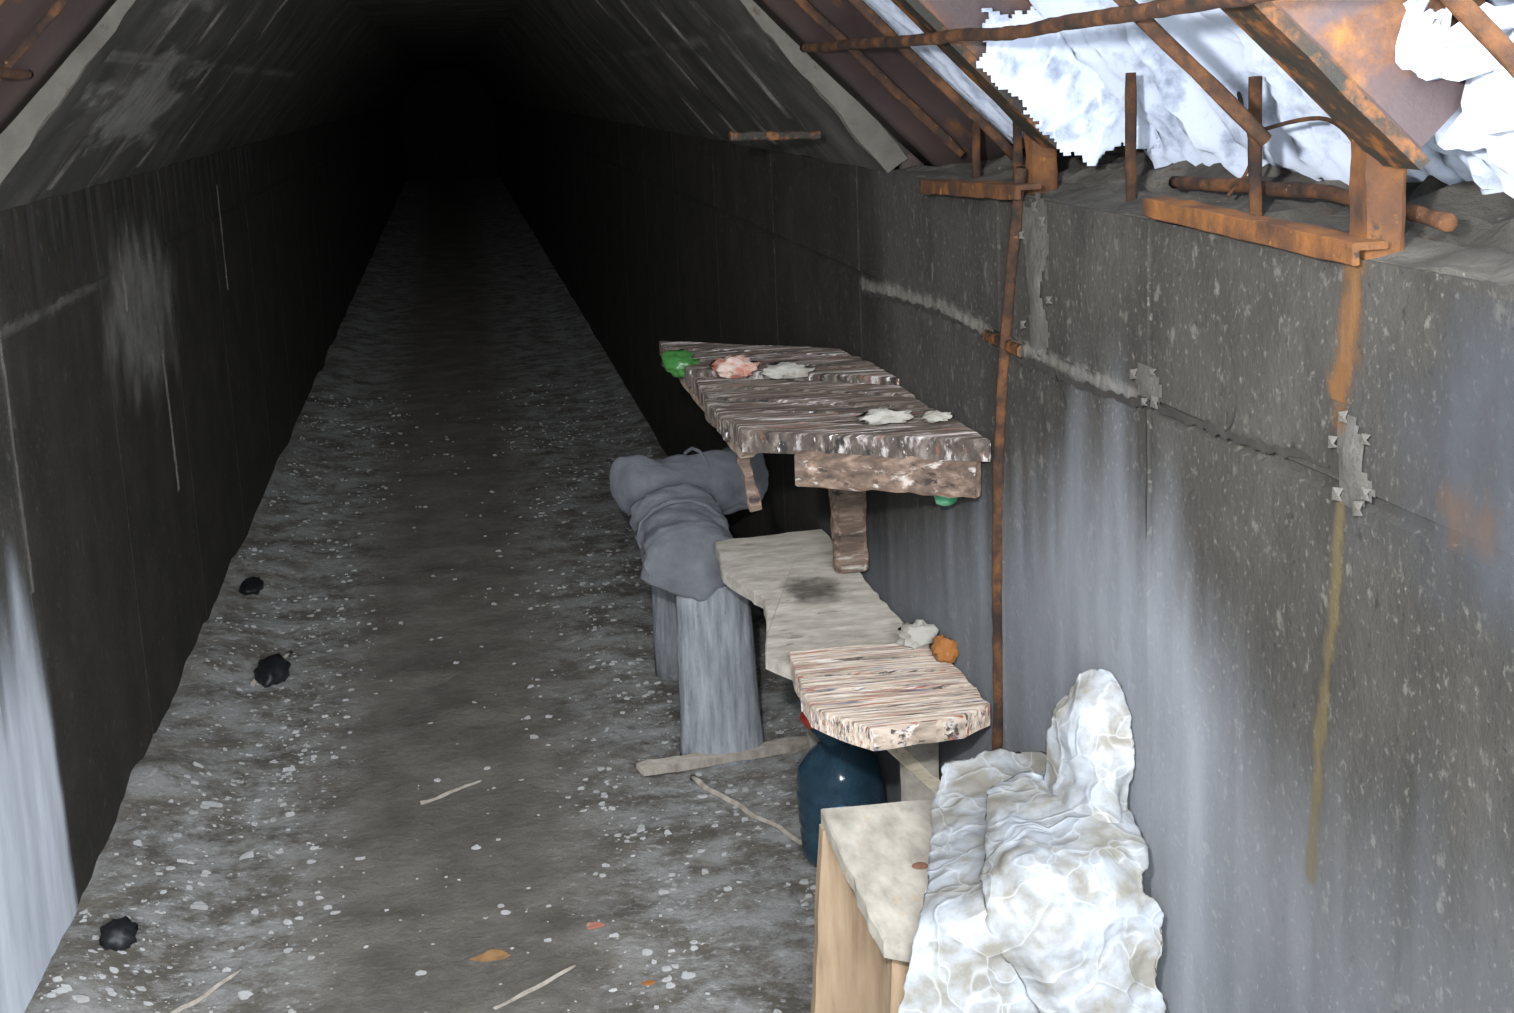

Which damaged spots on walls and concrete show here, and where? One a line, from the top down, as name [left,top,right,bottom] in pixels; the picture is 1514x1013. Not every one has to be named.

corrosion [1326,506,1343,662]
damp [0,592,77,1013]